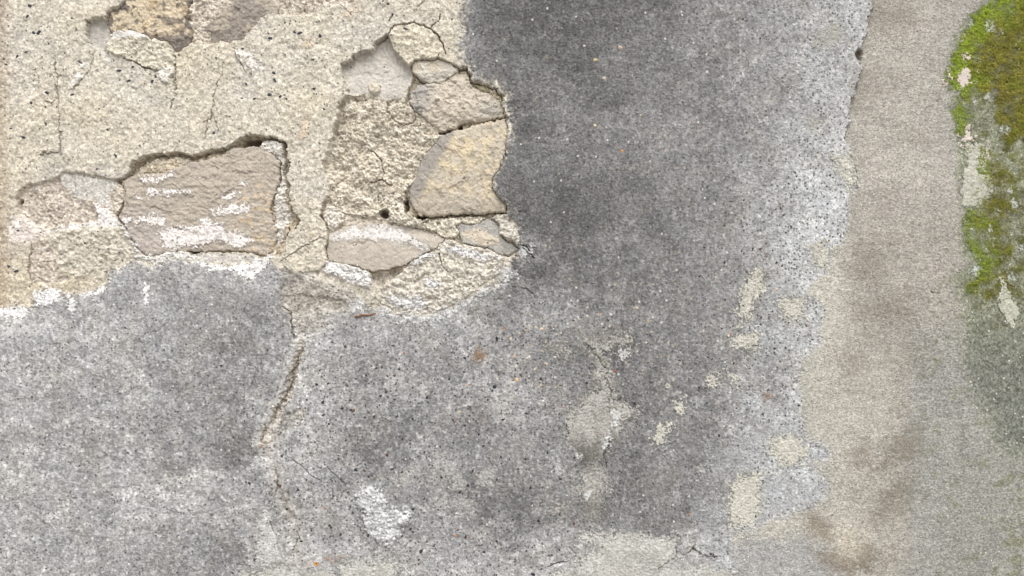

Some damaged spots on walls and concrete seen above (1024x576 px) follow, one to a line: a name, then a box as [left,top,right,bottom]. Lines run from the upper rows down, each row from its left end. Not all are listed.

spalling [188,0,236,45]
spalling [260,0,356,16]
crack [377,0,446,55]
crack [125,53,178,109]
crack [370,151,391,186]
spalling [322,36,520,258]
spalling [18,136,300,257]
crack [282,143,330,261]
spalling [342,261,413,287]
crack [262,308,307,440]
damp [601,409,623,449]
damp [444,464,497,516]